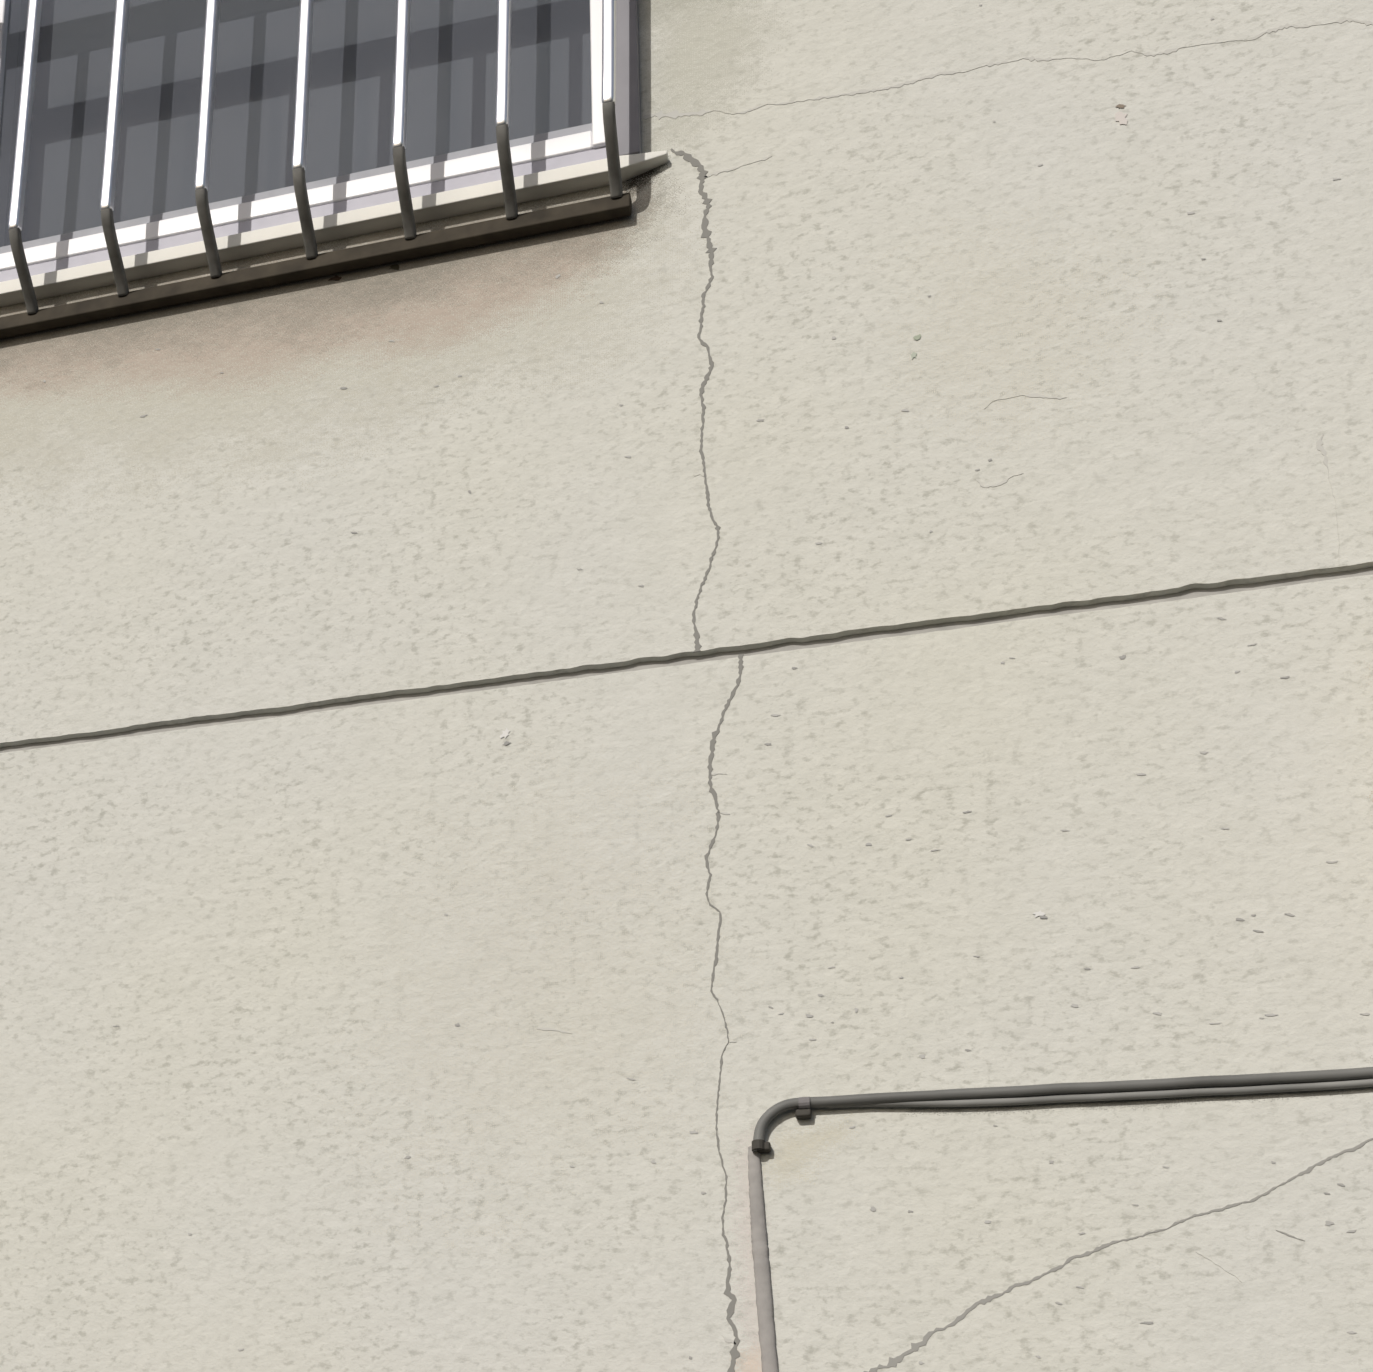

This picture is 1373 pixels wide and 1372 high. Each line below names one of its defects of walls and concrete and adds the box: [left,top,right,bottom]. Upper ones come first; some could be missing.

crack [643,18,1373,653]
crack [704,654,744,1372]
crack [864,1138,1373,1372]